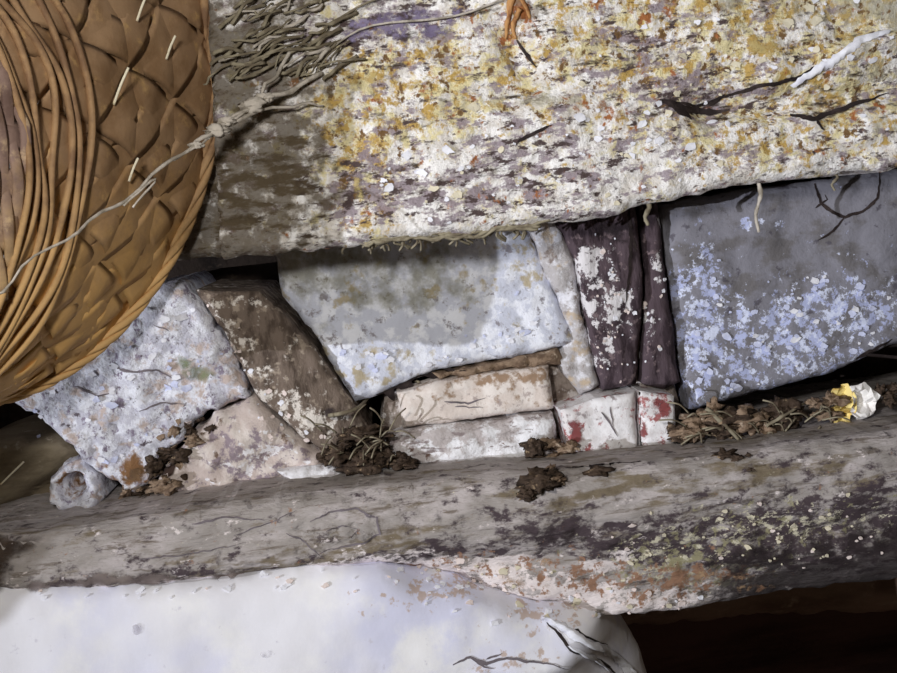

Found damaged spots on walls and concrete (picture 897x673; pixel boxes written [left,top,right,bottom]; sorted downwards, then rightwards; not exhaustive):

crack [659,30,891,119]
crack [790,93,888,130]